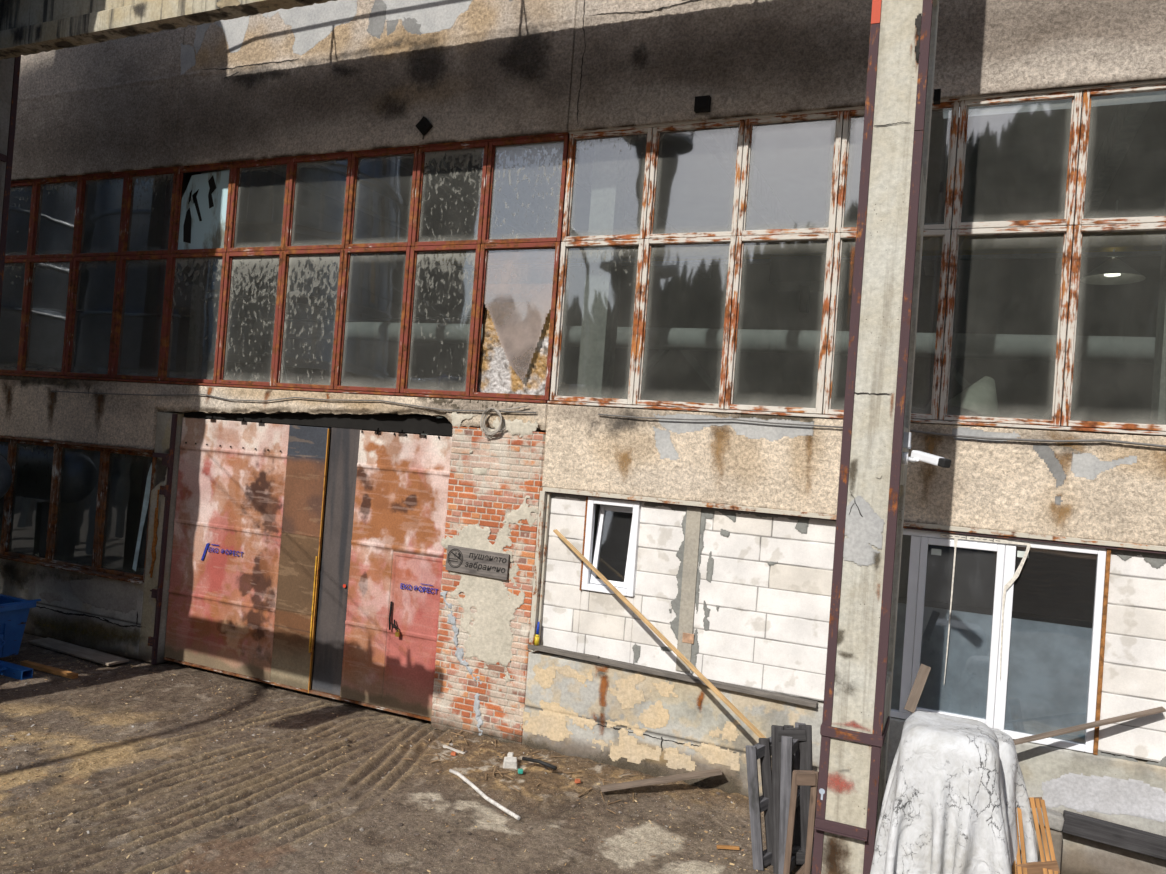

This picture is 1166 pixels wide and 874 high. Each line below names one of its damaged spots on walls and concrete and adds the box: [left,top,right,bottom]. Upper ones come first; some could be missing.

water stain [93,3,175,39]
water stain [187,12,227,22]
water stain [241,5,258,16]
peeling [180,0,472,74]
peeling [451,411,538,438]
peeling [653,414,814,460]
peeling [952,427,1020,443]
peeling [1033,443,1137,505]
peeling [441,495,538,682]
corrosion [594,666,608,729]
peeling [520,663,745,771]